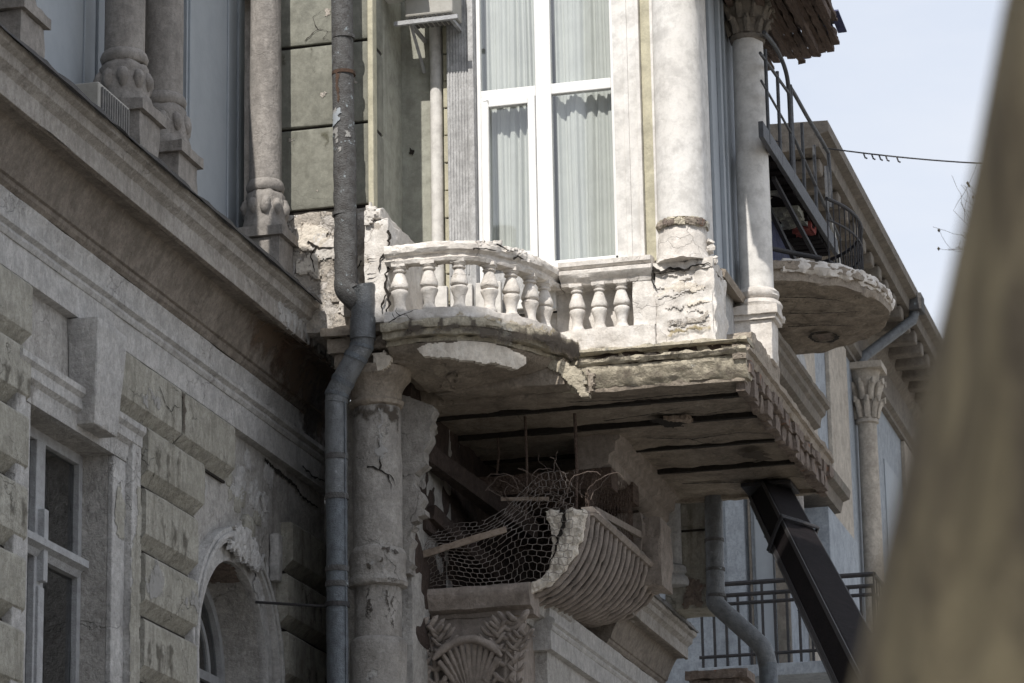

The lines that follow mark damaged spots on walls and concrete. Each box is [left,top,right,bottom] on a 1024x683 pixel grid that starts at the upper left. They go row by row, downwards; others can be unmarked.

peeling [333,107,351,152]
peeling [364,202,377,226]
peeling [295,222,334,280]
spalling [657,216,718,265]
peeling [330,286,351,317]
peeling [656,274,712,336]
spalling [402,382,421,401]
spalling [417,341,526,371]
spalling [548,358,597,399]
crack [367,441,396,486]
spalling [415,413,640,651]